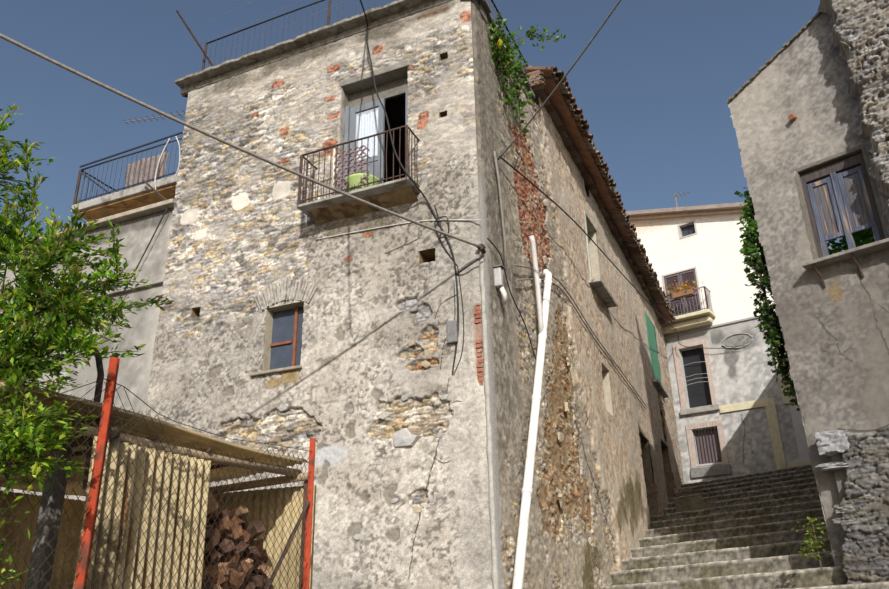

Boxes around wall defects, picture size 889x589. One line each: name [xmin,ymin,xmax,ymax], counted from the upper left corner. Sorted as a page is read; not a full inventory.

spalling [509,123,551,273]
spalling [397,298,439,371]
flaking render [474,301,482,324]
flaking render [476,339,484,386]
spalling [217,404,322,453]
spalling [367,393,453,448]